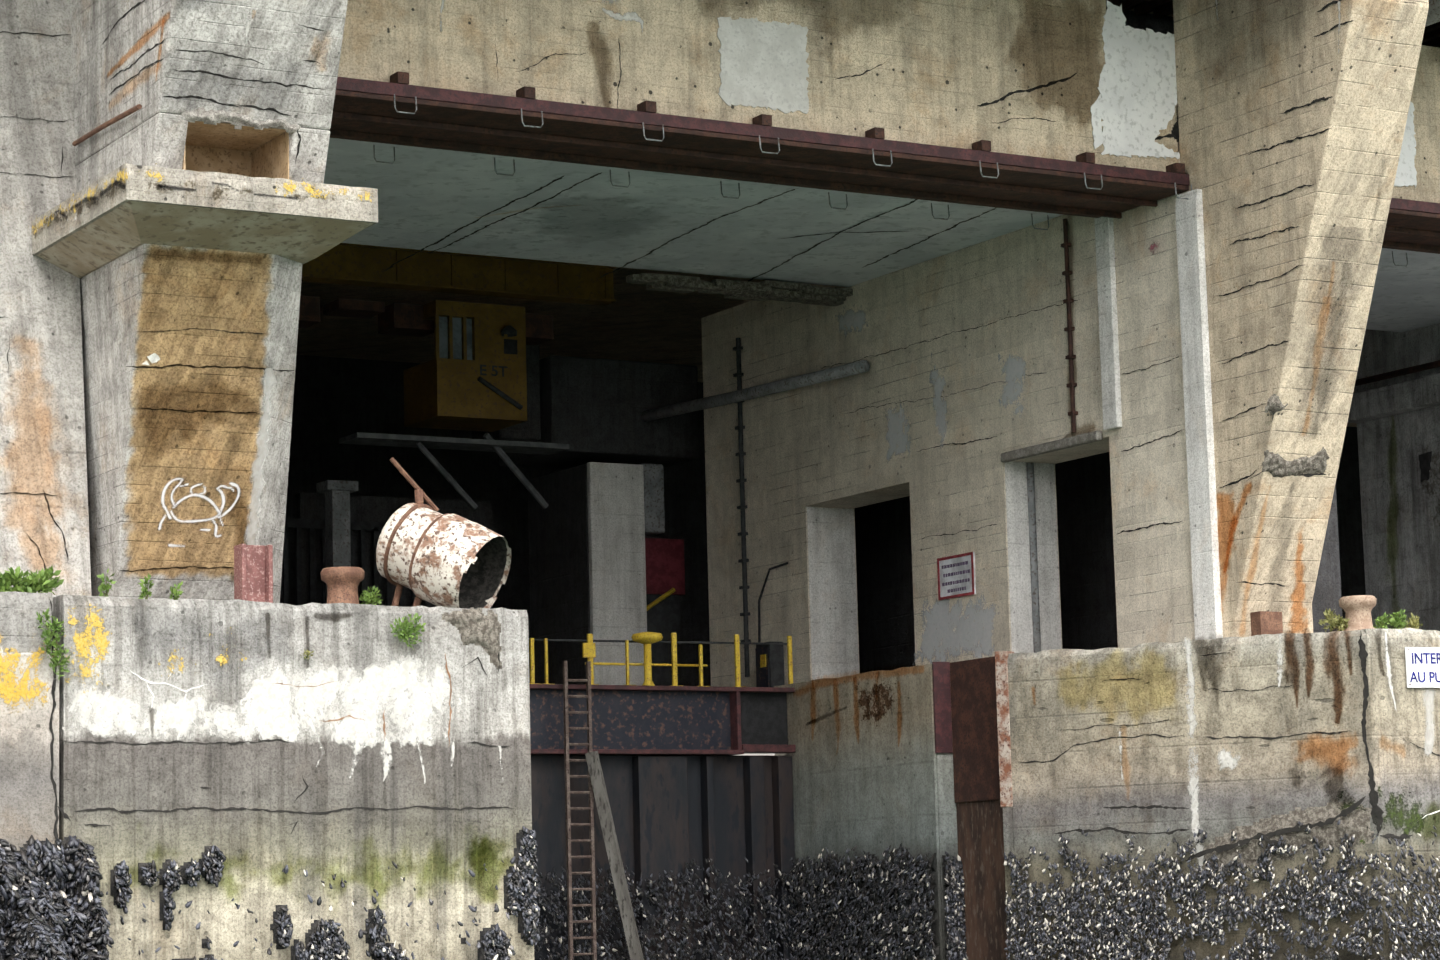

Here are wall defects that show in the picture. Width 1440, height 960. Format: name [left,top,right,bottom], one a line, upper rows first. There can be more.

crack [103,0,324,116]
crack [835,63,884,80]
crack [978,73,1076,123]
peeling [1090,1,1180,159]
peeling [1418,449,1440,522]
damp [63,655,463,782]
rust [843,683,894,726]
crack [1022,631,1440,841]
rust [1277,629,1352,724]